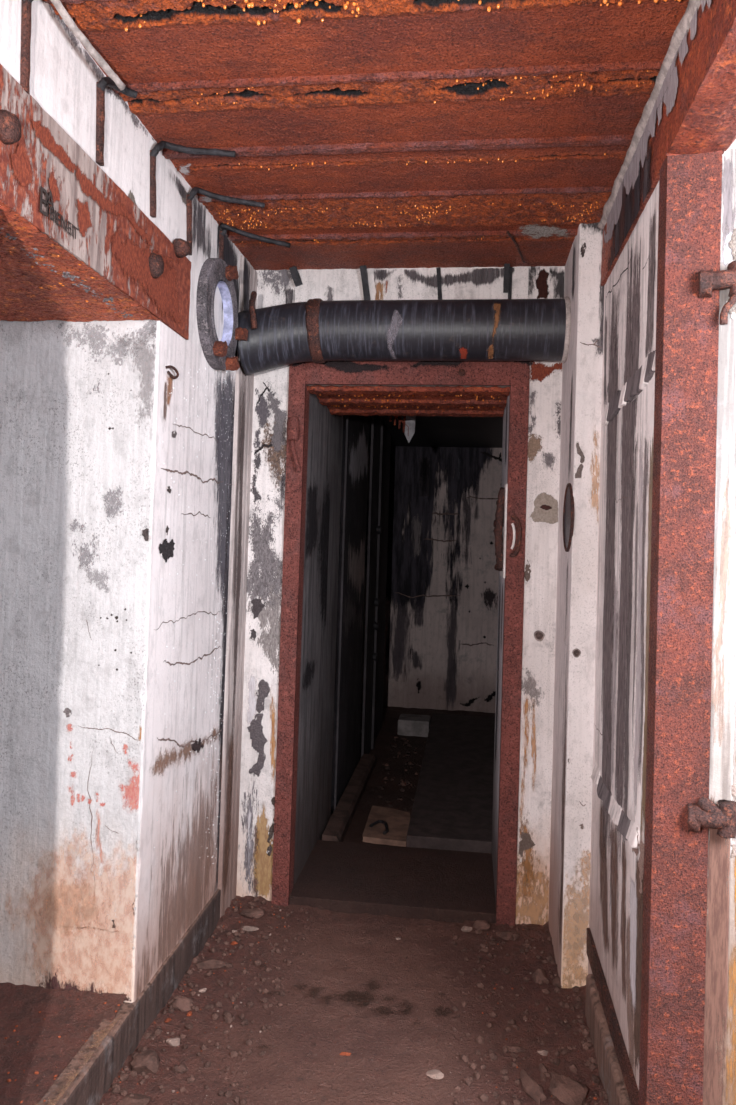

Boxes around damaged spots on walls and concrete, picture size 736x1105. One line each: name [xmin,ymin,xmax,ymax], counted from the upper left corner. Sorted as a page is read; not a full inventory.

rust [11,144,33,187]
rust [31,120,183,324]
water stain [599,141,656,404]
water stain [722,159,735,265]
crack [157,611,219,630]
crack [165,646,221,666]
crack [161,468,231,485]
peeling [246,382,288,777]
water stain [386,405,508,708]
water stain [591,397,653,1069]
water stain [711,479,736,741]
water stain [703,828,732,1105]